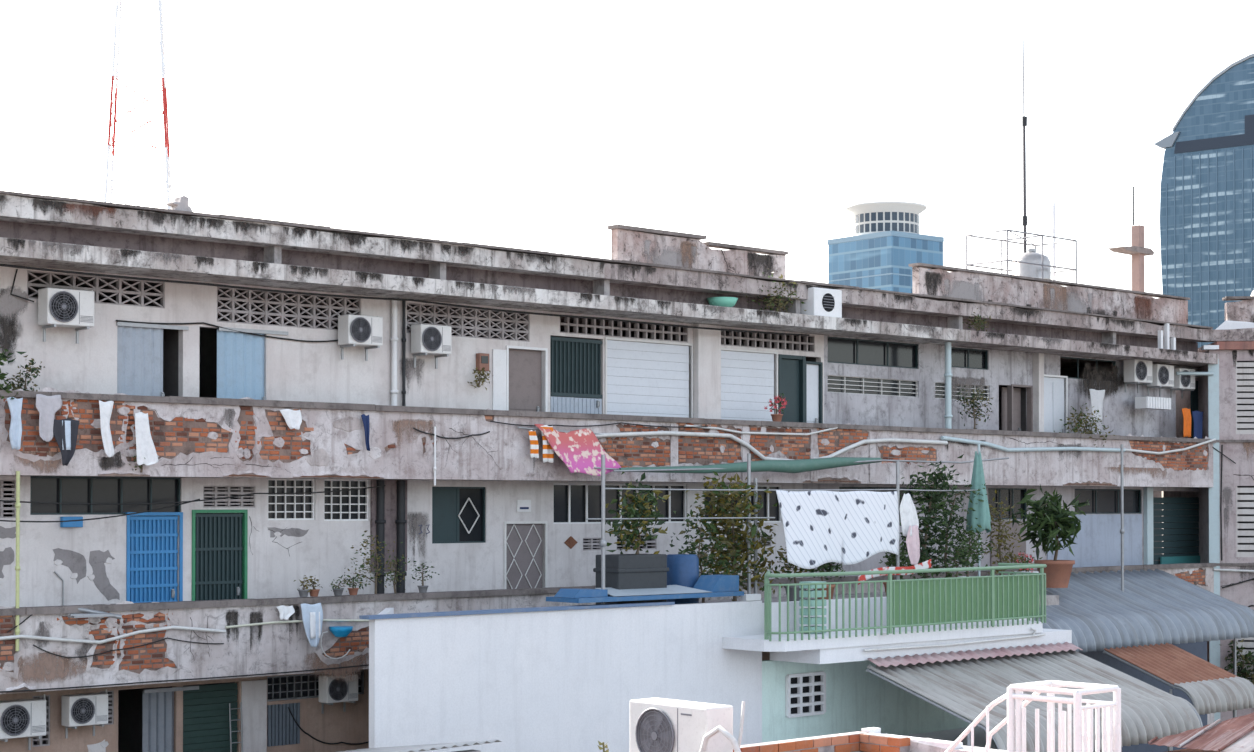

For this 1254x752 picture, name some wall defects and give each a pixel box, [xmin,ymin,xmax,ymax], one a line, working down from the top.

water stain [33,199,115,217]
water stain [138,211,266,232]
water stain [333,232,366,244]
water stain [390,239,474,254]
water stain [507,251,557,265]
water stain [925,271,942,295]
water stain [0,313,21,357]
spalling [0,387,385,479]
spalling [379,436,397,458]
spalling [52,548,183,678]
spalling [0,606,37,694]
spalling [315,622,369,665]